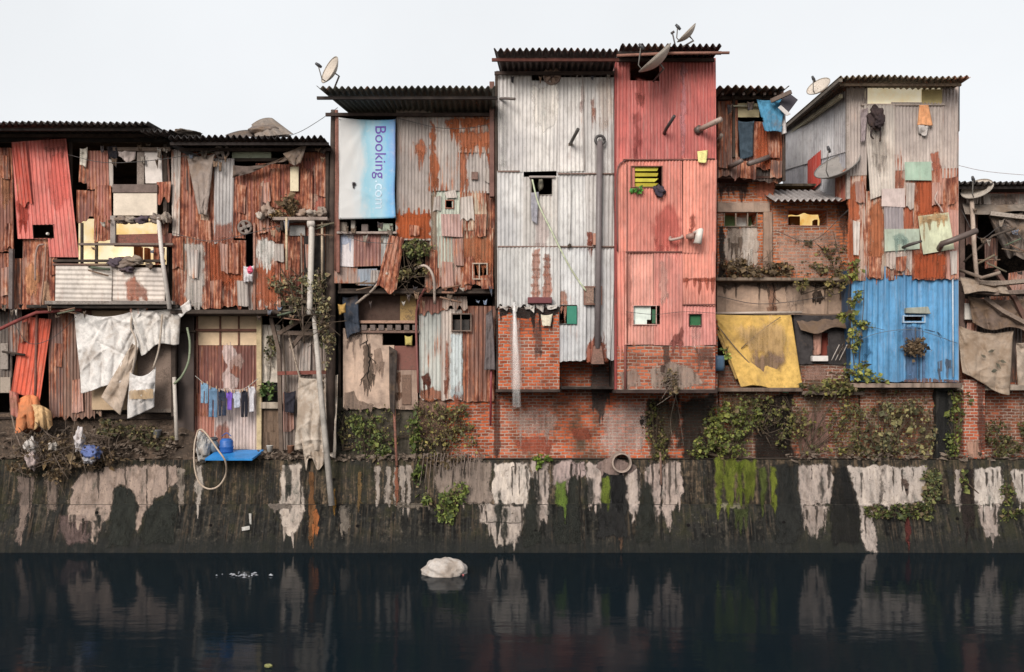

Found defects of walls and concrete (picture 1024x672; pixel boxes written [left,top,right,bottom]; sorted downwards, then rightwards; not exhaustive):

corrosion [415,117,495,199]
corrosion [16,202,28,233]
corrosion [396,207,431,239]
corrosion [847,152,947,283]
corrosion [209,224,242,292]
corrosion [256,265,278,310]
corrosion [531,249,567,317]
crack [360,334,376,392]
leakage [717,394,804,544]
leakage [93,486,178,548]
leakage [494,493,508,553]